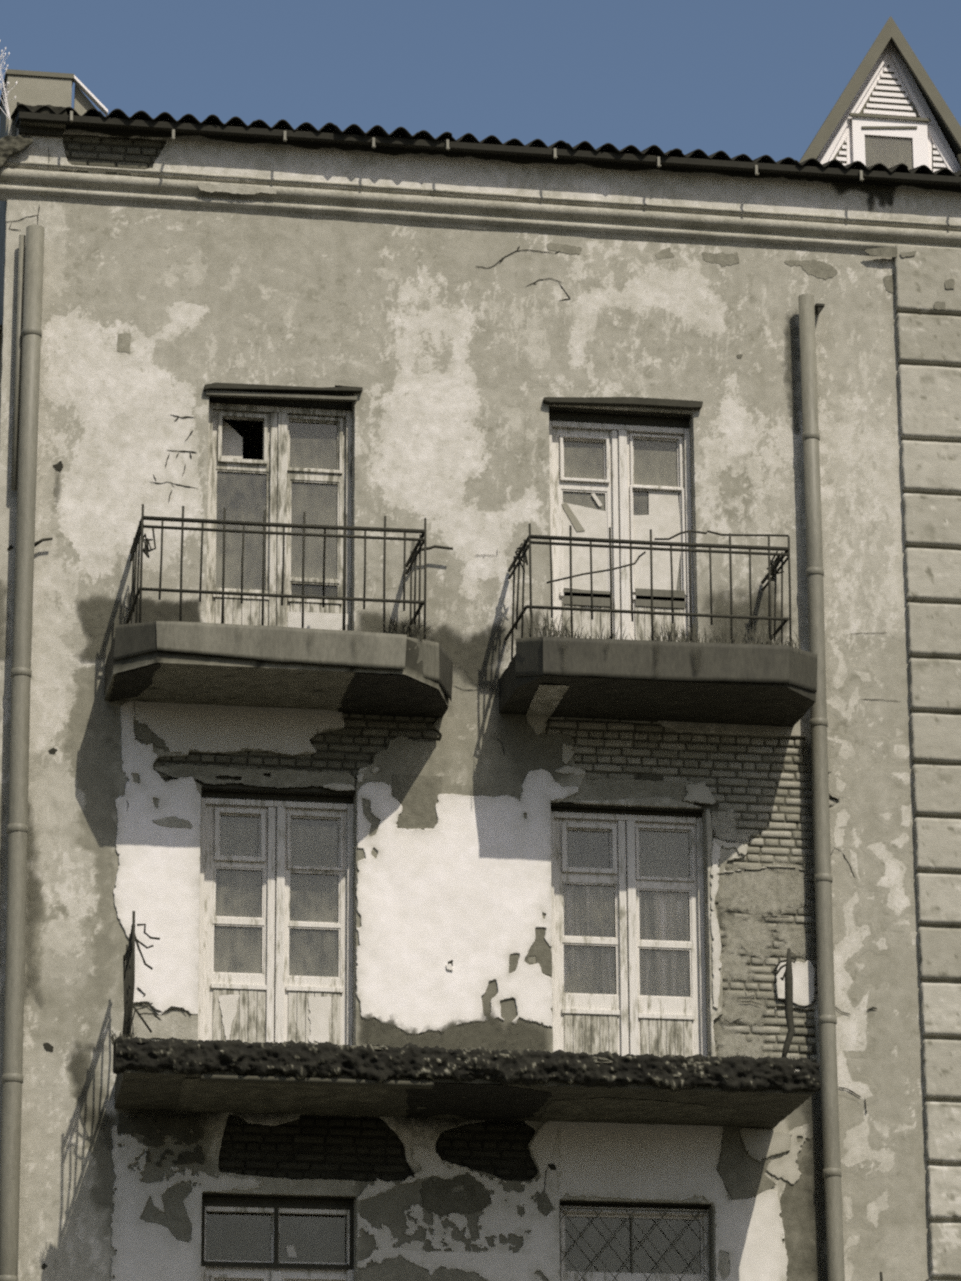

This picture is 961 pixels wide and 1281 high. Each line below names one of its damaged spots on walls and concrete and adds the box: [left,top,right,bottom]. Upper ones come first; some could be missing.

crack [476,246,570,301]
spalling [934,279,955,310]
peeling [4,538,16,748]
peeling [22,200,908,1094]
peeling [826,645,921,1281]
peeling [111,1109,823,1281]